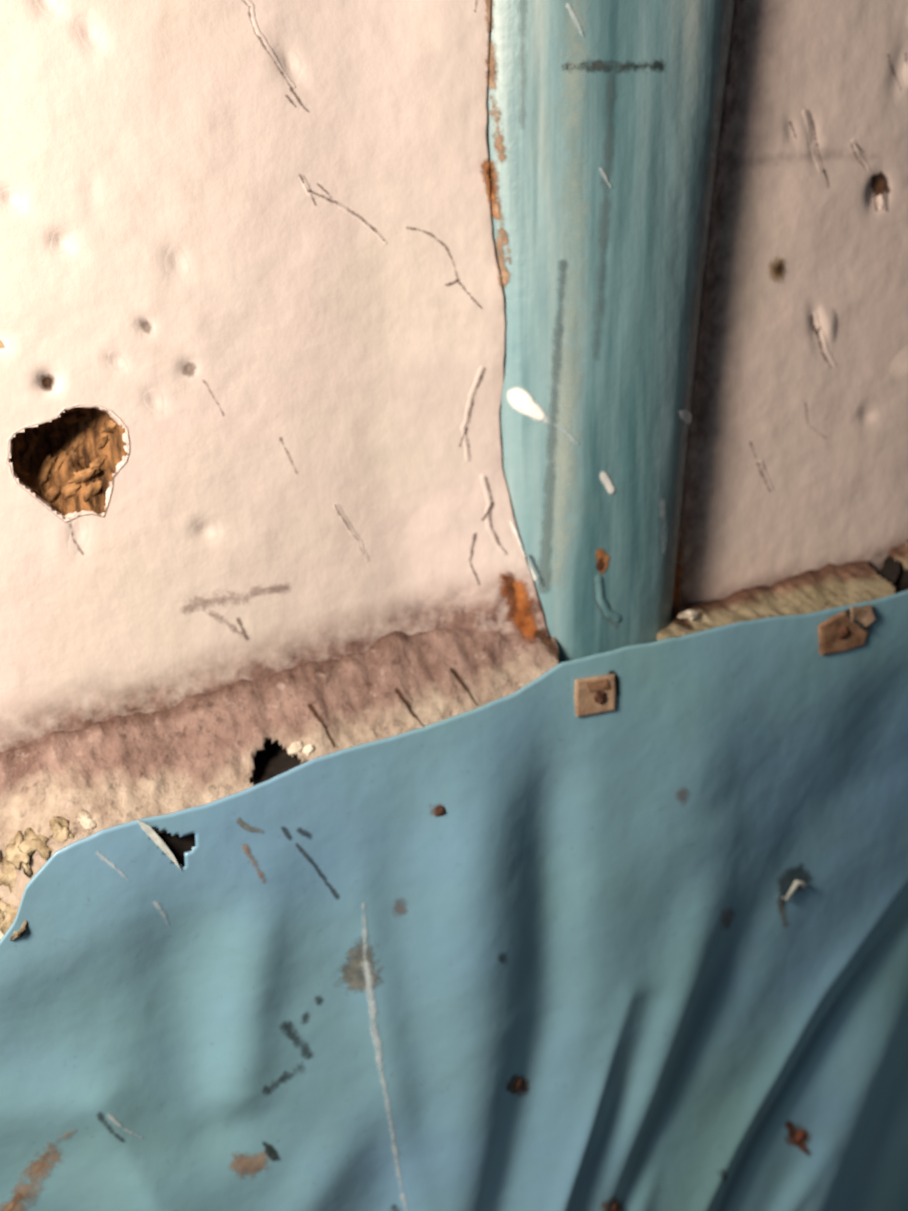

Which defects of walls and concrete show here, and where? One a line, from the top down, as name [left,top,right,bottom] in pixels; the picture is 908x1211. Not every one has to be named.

crack [244,0,307,110]
flaking render [871,172,890,211]
crack [299,174,481,307]
flaking render [6,403,131,523]
corrosion [501,573,559,660]
flaking render [0,809,97,946]
corrosion [507,1075,529,1097]
corrosion [0,1148,59,1211]
corrosion [231,1142,279,1175]
corrosion [785,1121,810,1156]